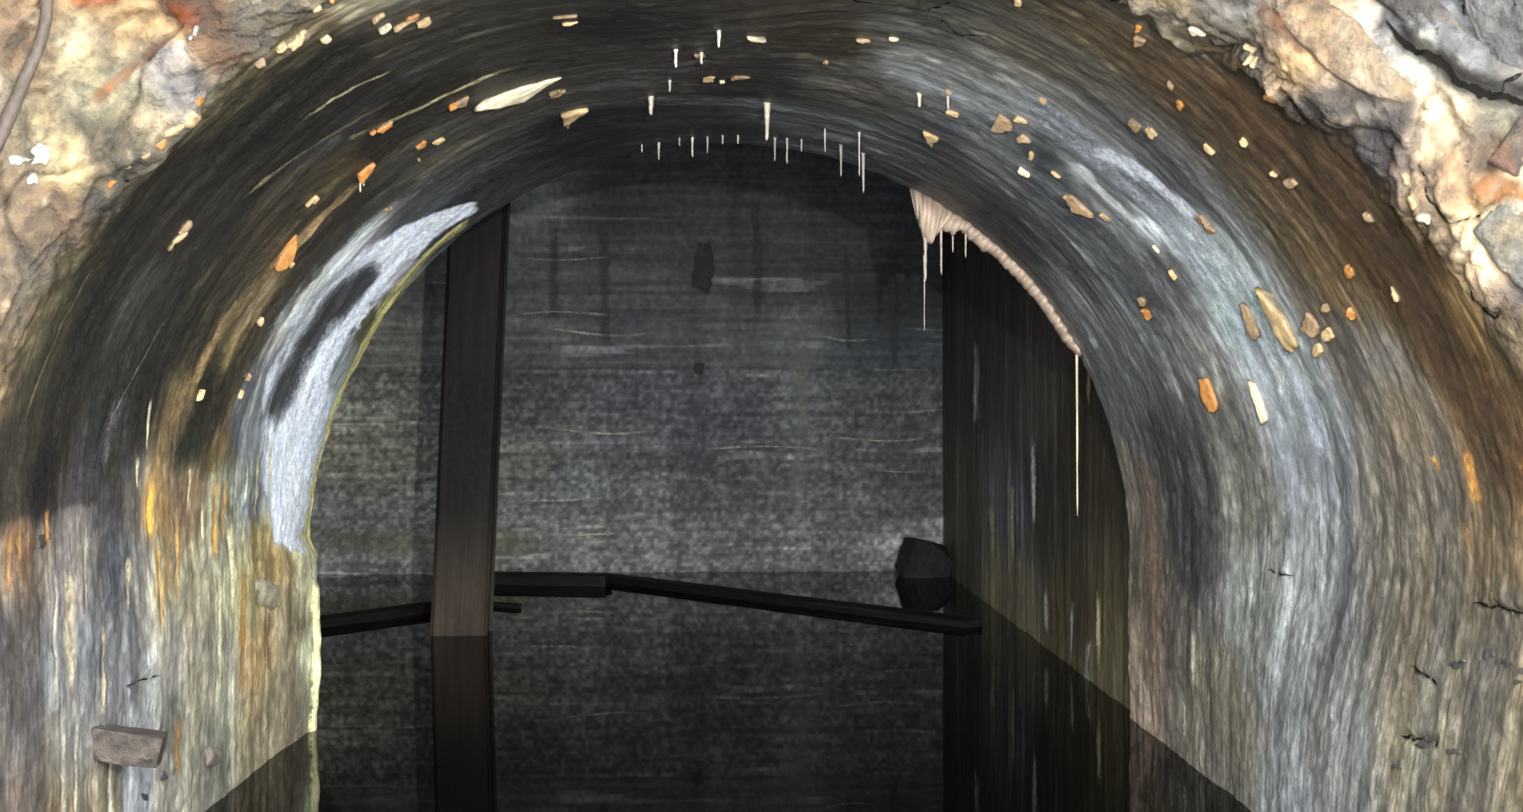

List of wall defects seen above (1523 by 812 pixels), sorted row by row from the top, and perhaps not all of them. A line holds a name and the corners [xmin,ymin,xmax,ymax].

damp [399,73,494,118]
damp [910,189,1082,357]
damp [90,332,158,483]
rust [7,533,21,586]
damp [53,547,87,685]
damp [126,560,141,699]
rust [146,486,179,631]
rust [213,485,227,554]
damp [218,531,235,676]
rust [239,525,257,694]
damp [1070,599,1101,681]
damp [61,713,78,812]